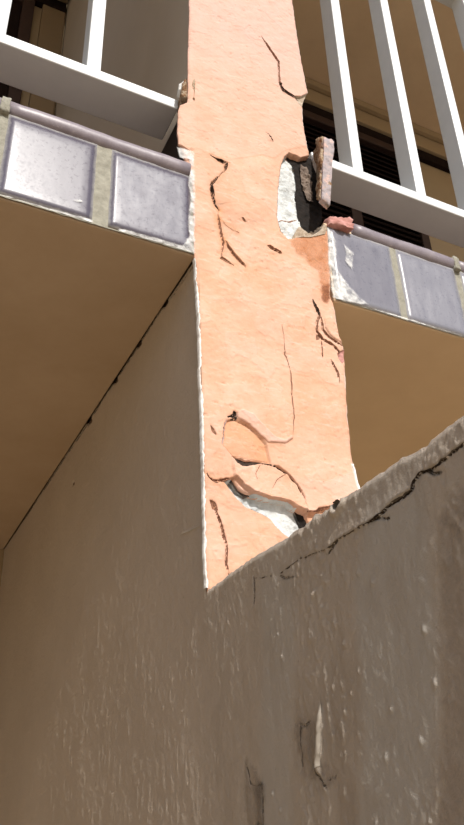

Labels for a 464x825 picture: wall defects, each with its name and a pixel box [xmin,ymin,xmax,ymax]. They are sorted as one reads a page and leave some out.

crack [263,39,307,107]
crack [210,155,228,211]
spalling [277,156,327,239]
crack [207,458,308,575]
spalling [210,409,360,537]
crack [253,442,464,602]